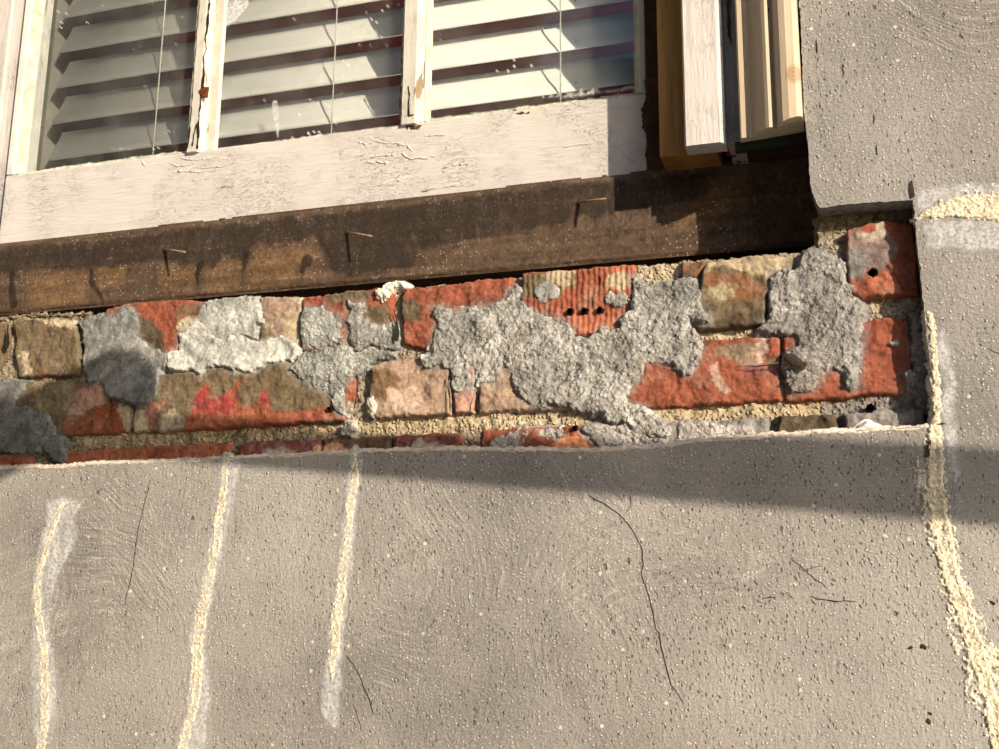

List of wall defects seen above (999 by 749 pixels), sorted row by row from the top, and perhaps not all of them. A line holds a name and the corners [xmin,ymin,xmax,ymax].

flaking render [0,209,927,467]
crack [590,496,684,704]